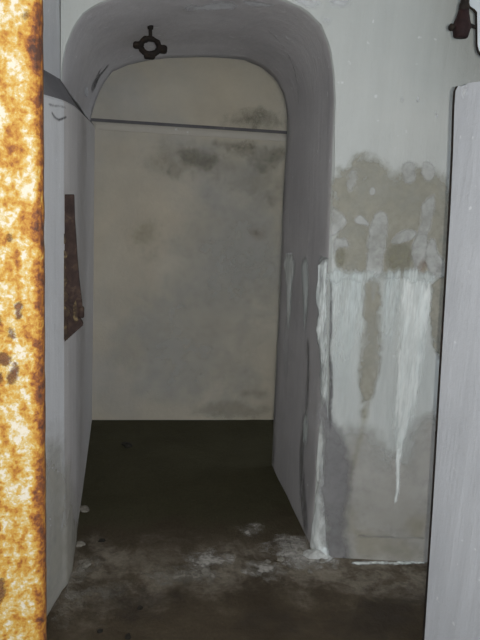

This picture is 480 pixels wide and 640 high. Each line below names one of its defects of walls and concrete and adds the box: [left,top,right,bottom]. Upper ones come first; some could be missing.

peeling [331,155,449,279]
rust [0,353,19,384]
water stain [276,255,444,568]